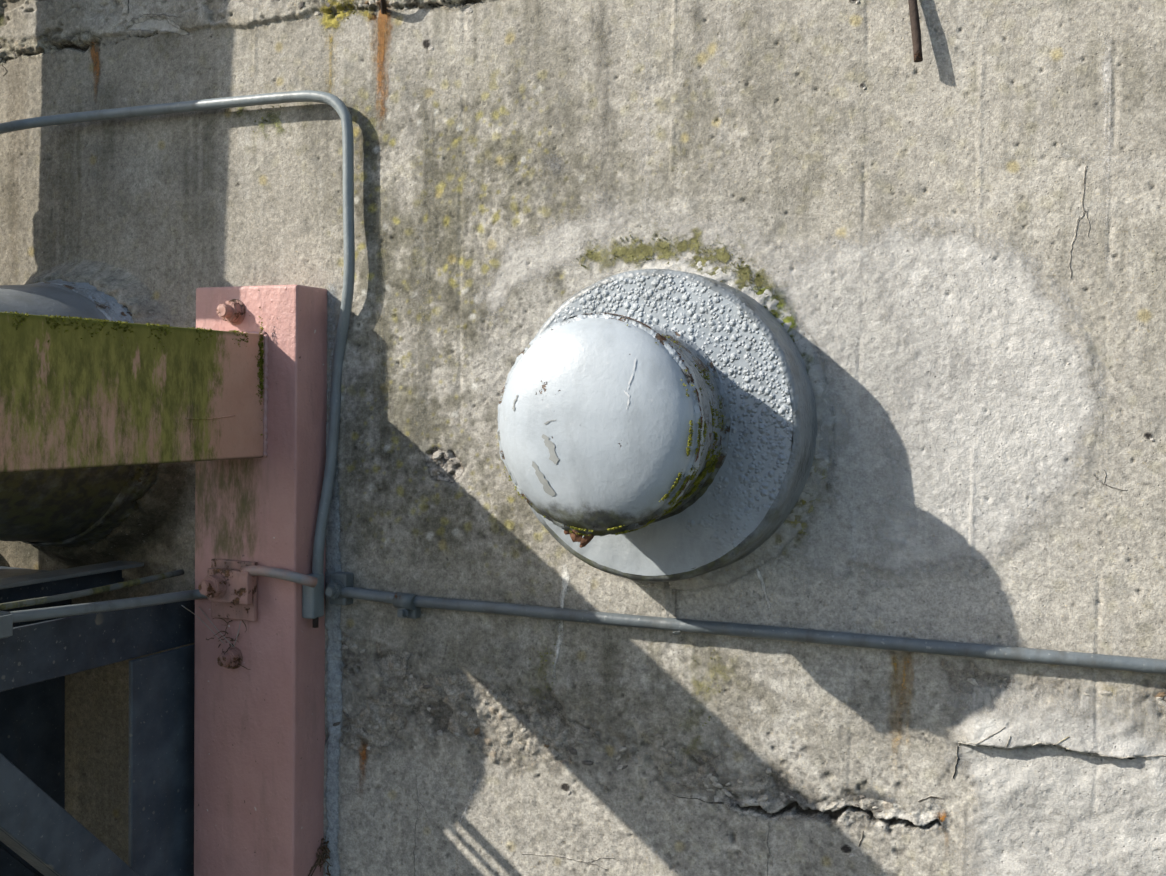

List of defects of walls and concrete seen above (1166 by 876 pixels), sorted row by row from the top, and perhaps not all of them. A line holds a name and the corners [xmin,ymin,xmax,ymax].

crack [0,0,183,77]
rust [377,2,390,115]
crack [399,0,481,10]
spalling [325,633,600,776]
crack [672,727,1166,876]